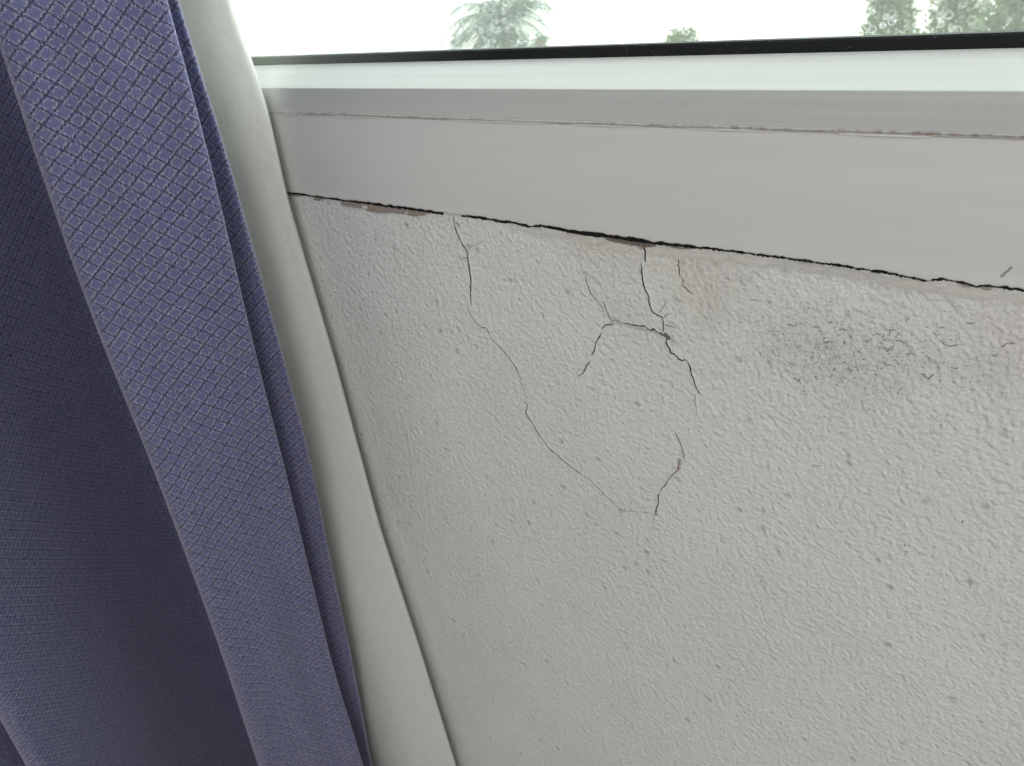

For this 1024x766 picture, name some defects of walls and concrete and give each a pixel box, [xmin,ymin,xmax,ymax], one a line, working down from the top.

crack [287,192,1024,528]